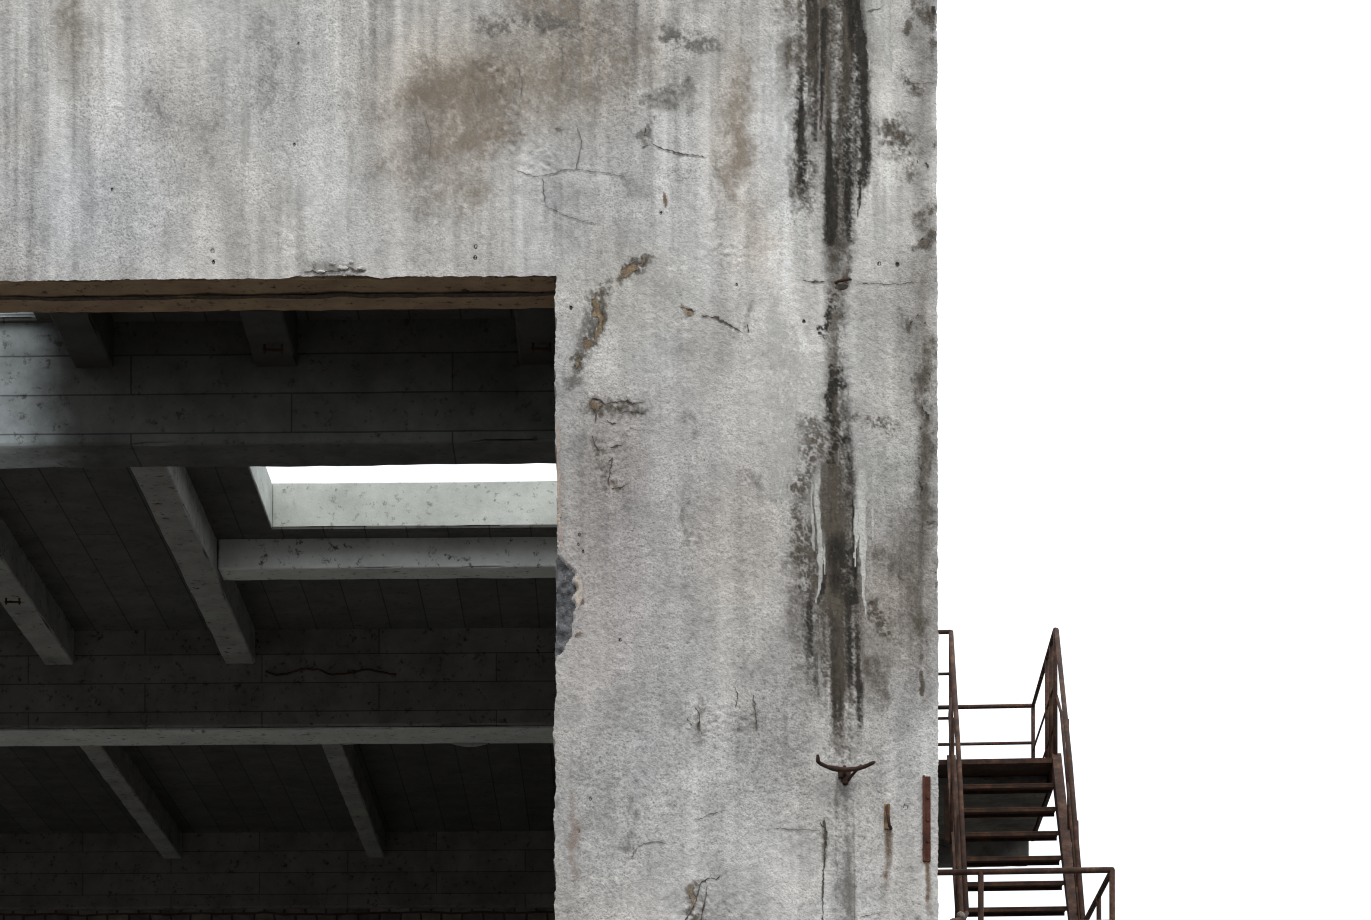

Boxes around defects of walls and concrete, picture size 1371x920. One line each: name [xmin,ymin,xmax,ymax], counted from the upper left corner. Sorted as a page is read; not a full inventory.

water stain [414,50,594,156]
crack [515,128,625,225]
crack [642,127,707,158]
spalling [617,255,647,281]
spalling [575,293,604,368]
water stain [768,0,937,747]
spalling [555,425,583,656]